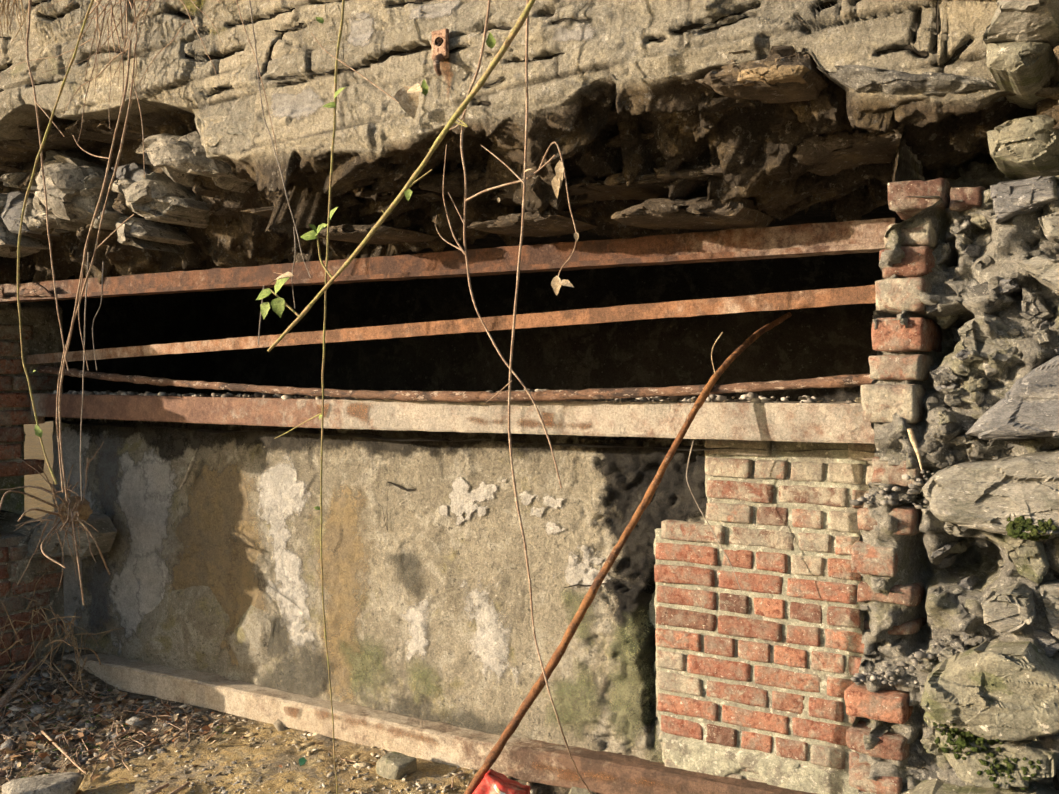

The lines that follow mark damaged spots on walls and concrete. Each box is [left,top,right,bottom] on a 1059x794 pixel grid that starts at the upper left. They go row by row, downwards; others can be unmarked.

rust [16,283,53,296]
rust [347,403,368,419]
rust [518,412,554,427]
spalling [25,509,117,558]
damp [369,554,506,736]
efflorescence [461,580,519,682]
damp [562,592,591,639]
damp [604,545,663,763]
rust [284,707,298,717]
rust [314,708,435,744]